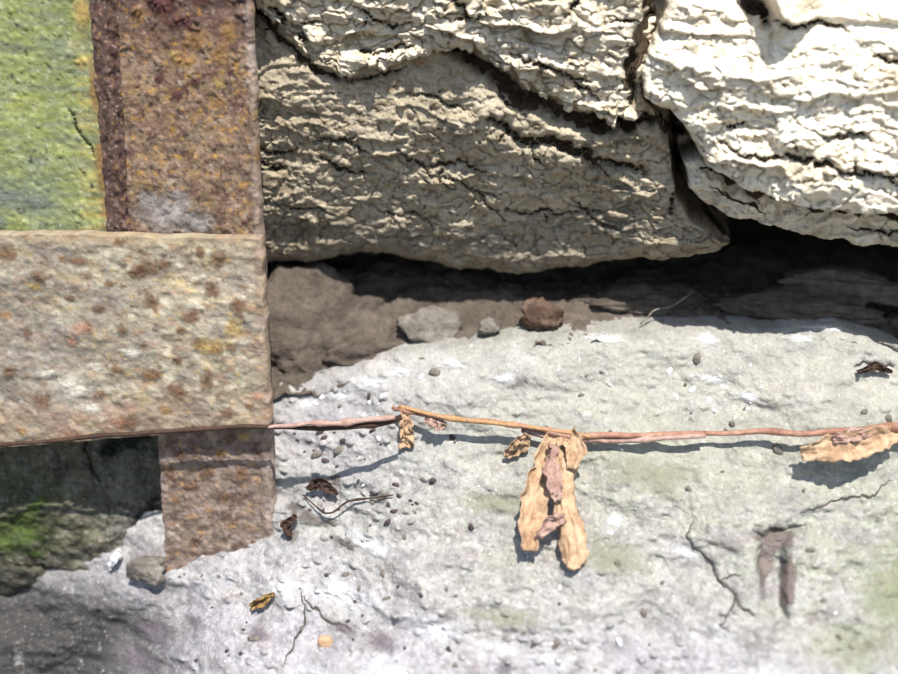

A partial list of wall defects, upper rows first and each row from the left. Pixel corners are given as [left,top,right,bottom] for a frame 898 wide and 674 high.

rust [134,0,204,46]
rust [89,0,132,247]
rust [196,248,224,266]
rust [128,261,170,277]
rust [145,293,158,310]
rust [176,311,197,334]
rust [194,299,244,353]
rust [169,383,184,398]
rust [114,414,139,428]
crack [801,480,891,513]
crack [685,519,753,625]